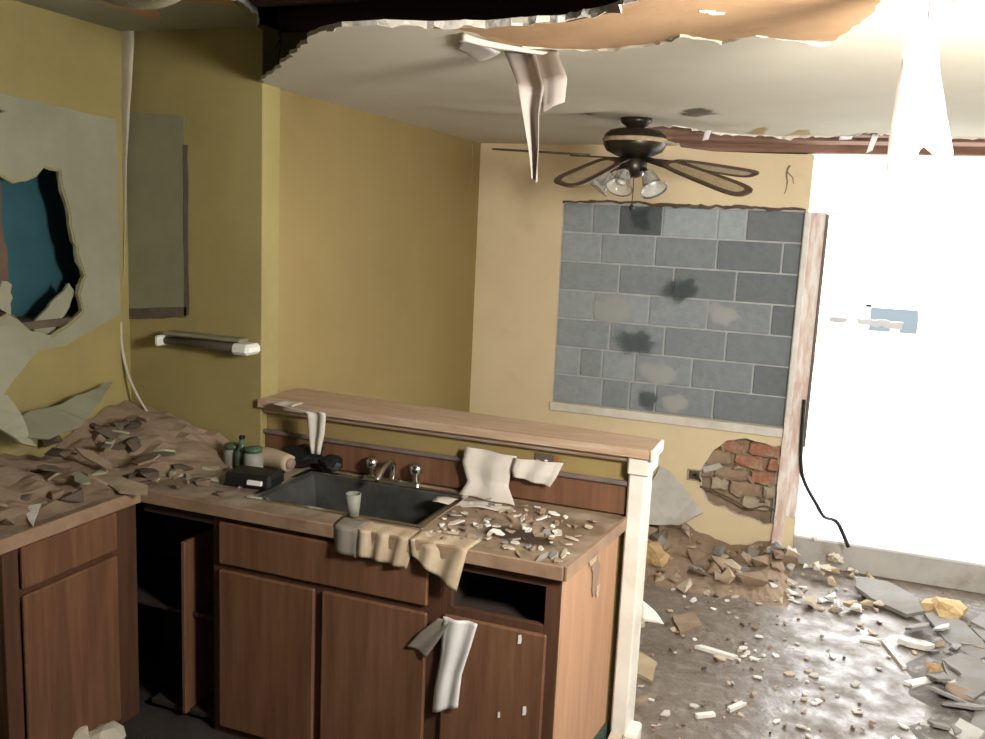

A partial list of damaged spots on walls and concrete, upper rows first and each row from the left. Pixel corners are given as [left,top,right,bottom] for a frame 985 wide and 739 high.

peeling [415,0,881,52]
peeling [0,0,261,352]
flaking render [700,438,781,525]